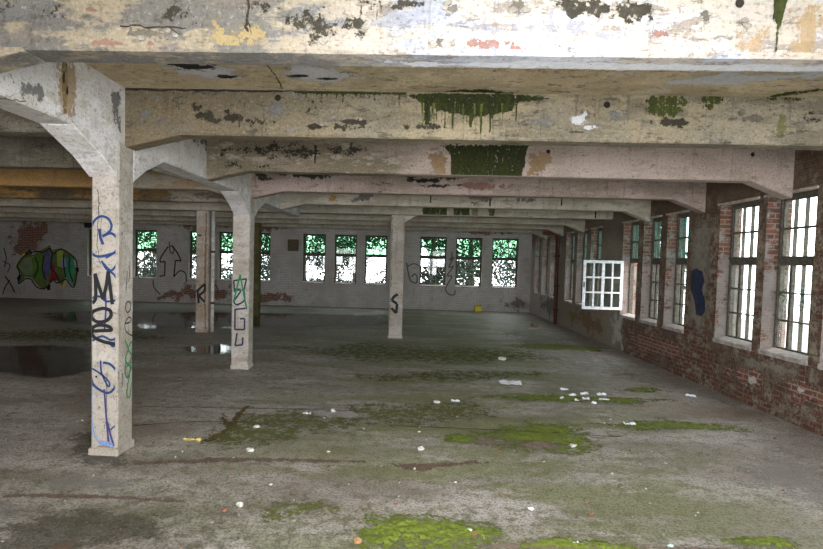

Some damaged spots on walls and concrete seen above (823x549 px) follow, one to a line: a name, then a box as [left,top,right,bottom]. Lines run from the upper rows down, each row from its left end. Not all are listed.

peeling [442,0,458,16]
peeling [498,0,531,14]
spalling [699,10,713,25]
spalling [429,38,455,48]
peeling [467,25,526,49]
peeling [157,64,243,80]
peeling [378,60,823,86]
peeling [18,82,44,102]
mould [650,115,689,128]
flaking render [153,282,196,302]
flaking render [214,281,232,302]
flaking render [714,355,823,411]